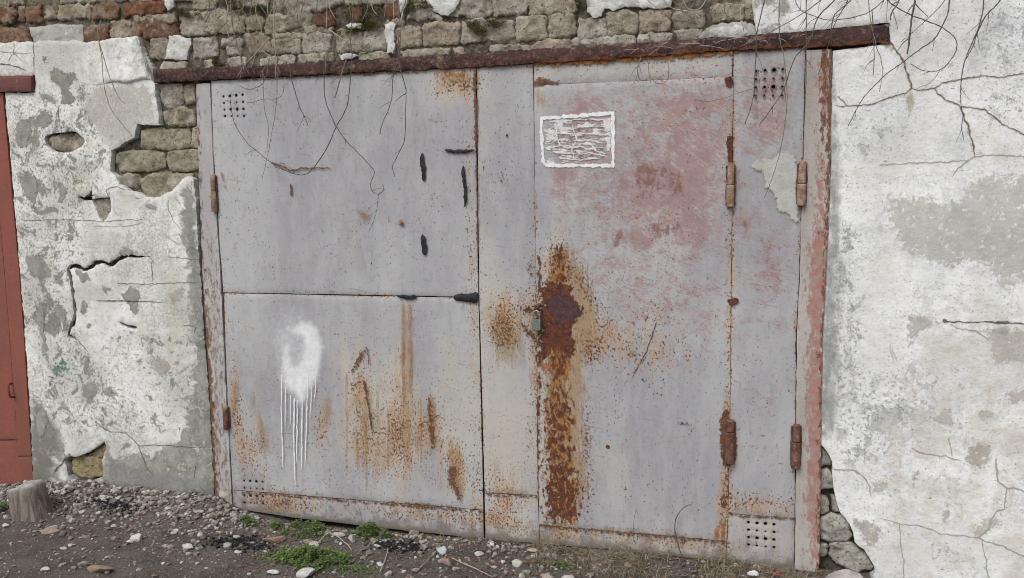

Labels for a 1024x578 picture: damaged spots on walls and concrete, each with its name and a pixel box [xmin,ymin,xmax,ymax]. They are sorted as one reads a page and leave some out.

rust [241,71,418,81]
flaking render [0,0,756,210]
rust [533,46,803,87]
crack [836,40,1024,173]
flaking render [70,443,106,479]
crack [70,209,198,352]
rust [232,392,483,513]
rust [345,347,389,453]
rust [484,236,796,544]
flaking render [819,445,881,572]
crack [885,461,1024,578]
crack [947,321,1023,341]